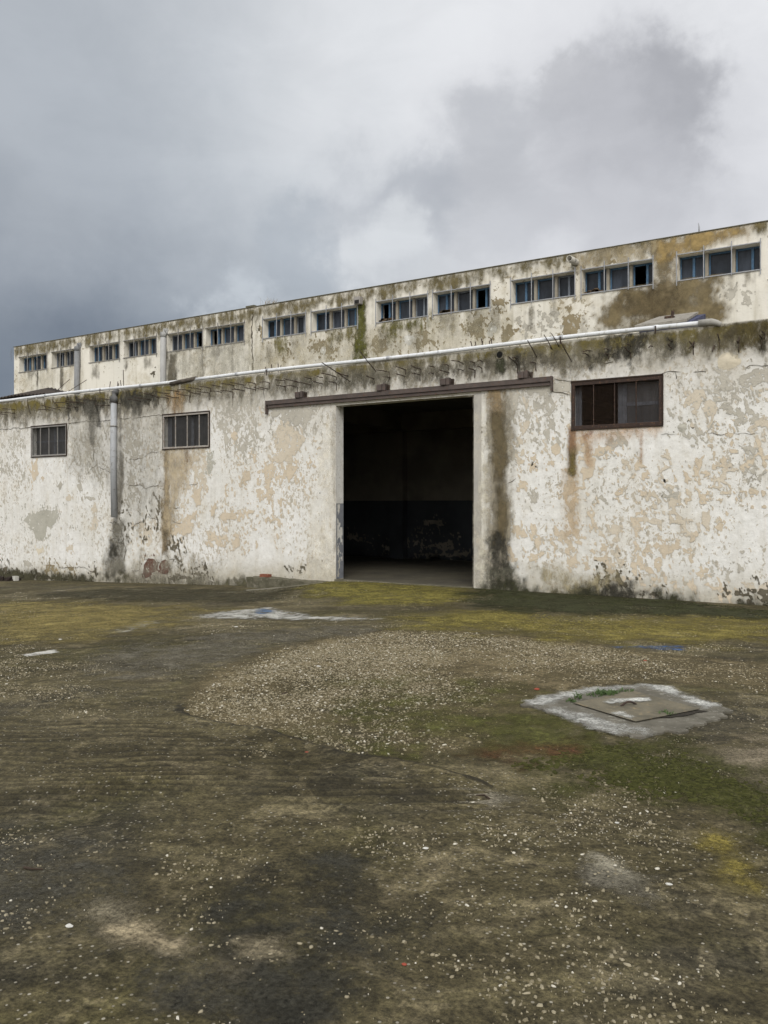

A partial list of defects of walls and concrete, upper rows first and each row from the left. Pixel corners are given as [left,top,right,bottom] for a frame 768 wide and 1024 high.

leakage [581,227,746,369]
leakage [38,368,306,603]
peeling [0,282,768,606]
leakage [465,389,515,590]